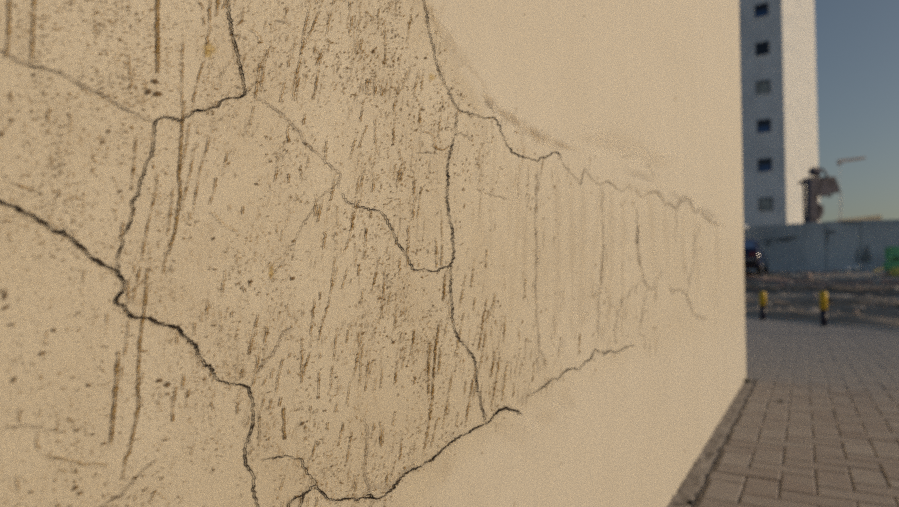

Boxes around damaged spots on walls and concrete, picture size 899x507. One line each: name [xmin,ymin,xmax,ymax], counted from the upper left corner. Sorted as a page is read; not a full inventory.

crack [0,0,718,507]